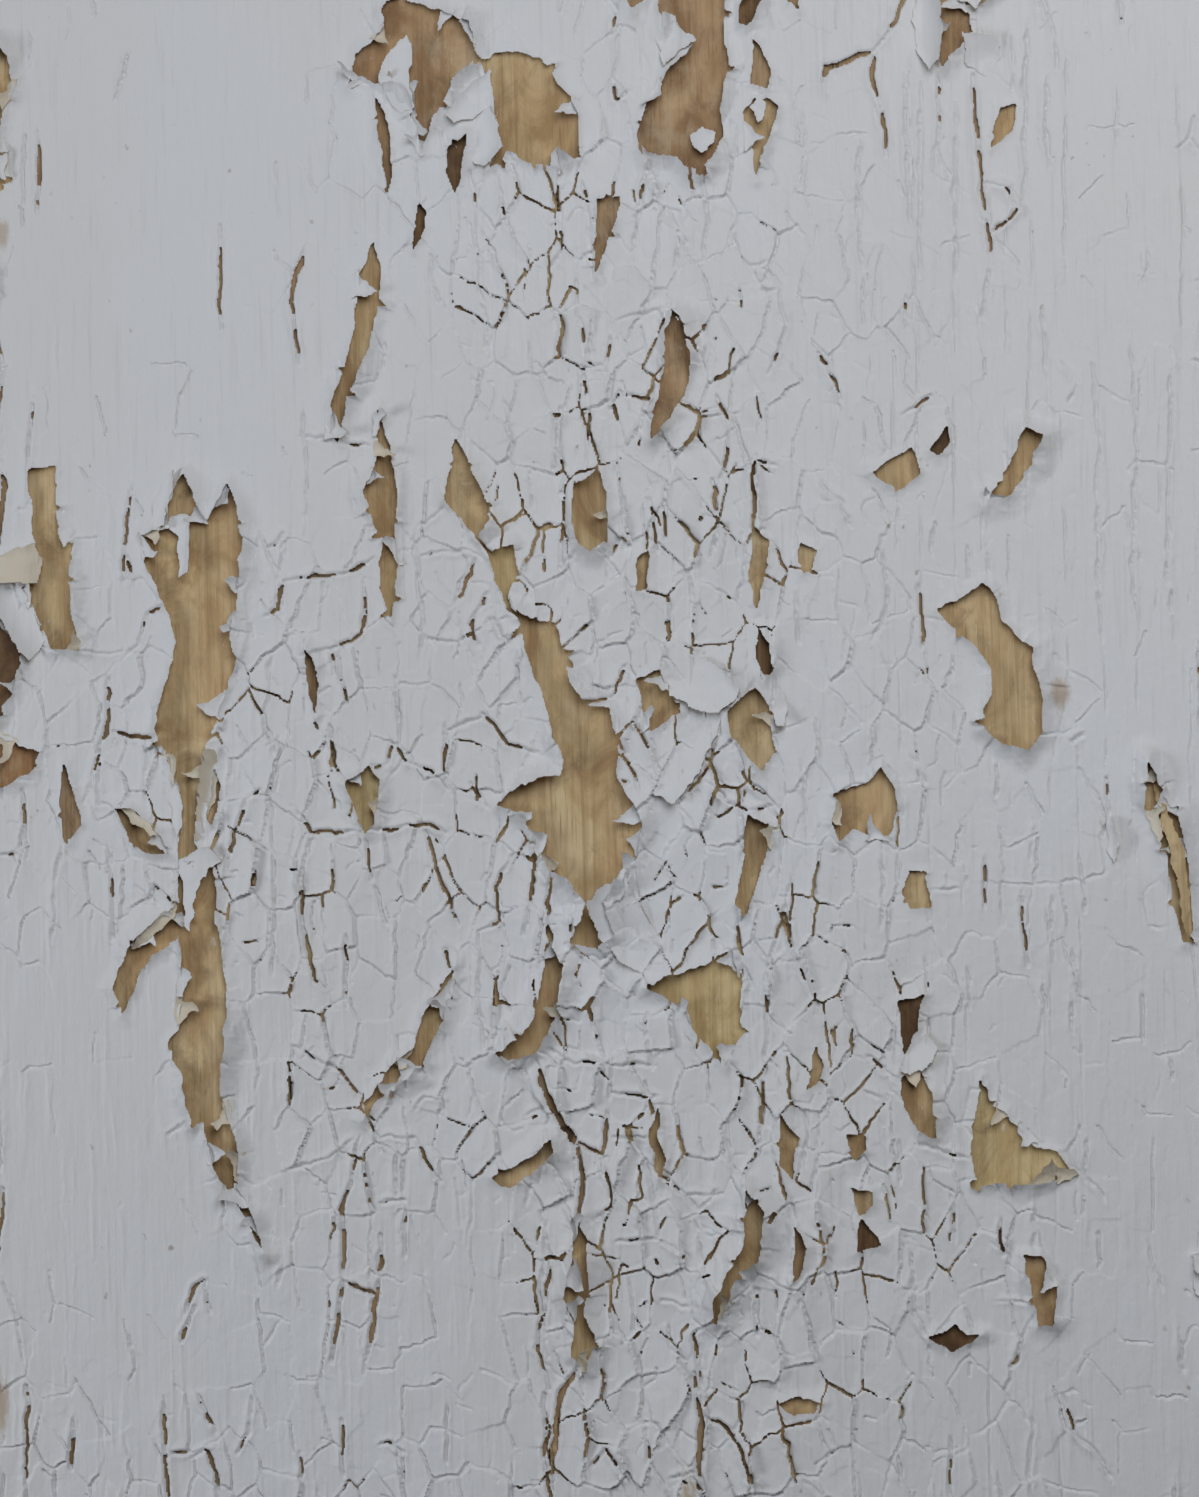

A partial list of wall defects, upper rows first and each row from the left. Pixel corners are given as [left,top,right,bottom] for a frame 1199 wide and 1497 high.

crack [0,336,51,555]
peeling [316,0,809,639]
crack [966,0,1071,379]
crack [0,468,172,980]
peeling [0,447,284,1272]
crack [118,130,1114,1497]
peeling [432,421,824,1086]
peeling [817,750,940,919]
peeling [915,563,1066,770]
peeling [886,985,1094,1204]
crack [0,1184,111,1497]
crack [1052,1339,1150,1487]